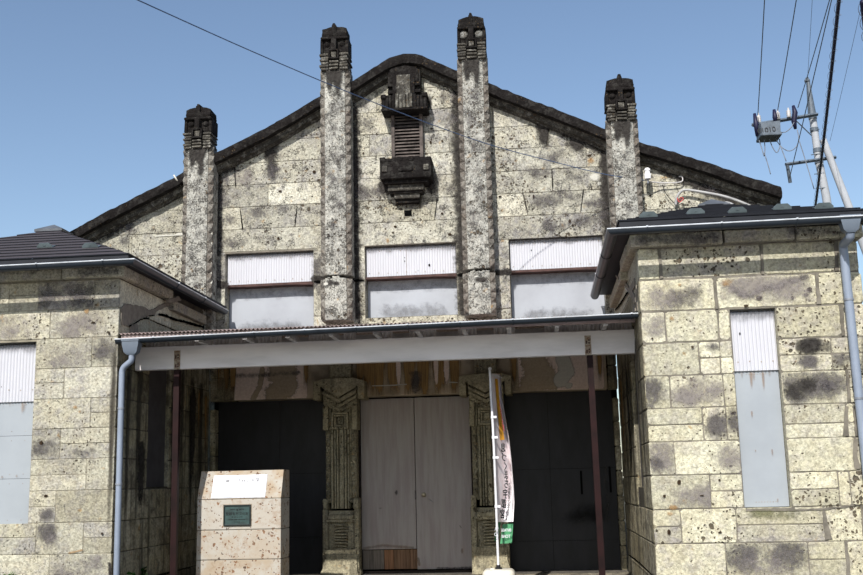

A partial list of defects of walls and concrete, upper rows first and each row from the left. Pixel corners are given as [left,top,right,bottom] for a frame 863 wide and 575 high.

damp [211,167,234,298]
damp [264,145,279,178]
damp [349,104,388,319]
damp [427,90,479,321]
damp [534,123,610,245]
crack [129,313,204,331]
peeling [234,366,308,400]
peeling [518,355,604,391]
damp [783,338,850,404]
damp [618,337,722,507]
damp [38,509,56,543]
damp [726,543,805,575]